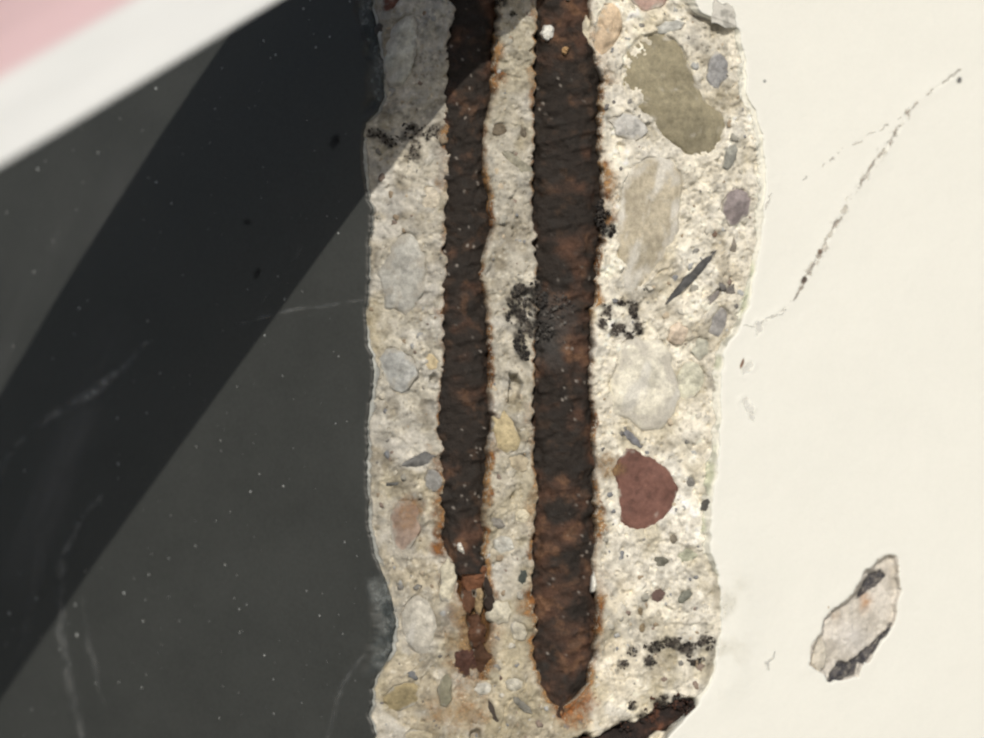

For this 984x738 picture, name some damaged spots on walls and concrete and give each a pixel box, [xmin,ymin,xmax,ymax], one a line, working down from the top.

rust [489,33,505,93]
crack [853,70,959,184]
rust [505,270,575,380]
spalling [360,0,766,738]
rust [589,80,643,339]
crack [747,206,847,327]
rust [591,454,619,541]
rust [454,526,502,681]
rust [521,587,595,726]
rust [592,594,605,635]
rust [616,692,696,733]
spalling [809,555,901,682]